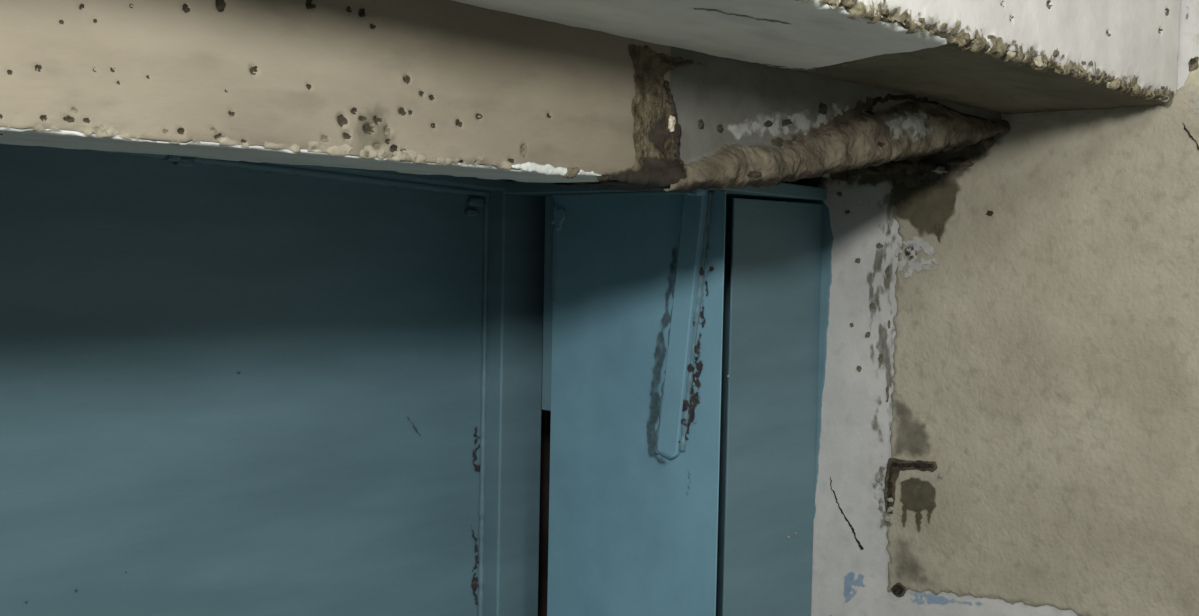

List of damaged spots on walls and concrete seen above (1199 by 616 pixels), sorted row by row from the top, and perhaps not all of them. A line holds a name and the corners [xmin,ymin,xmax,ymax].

spalling [796,0,1199,104]
crack [1182,122,1199,150]
peeling [850,194,938,441]
crack [830,477,864,550]
leakage [900,478,936,532]